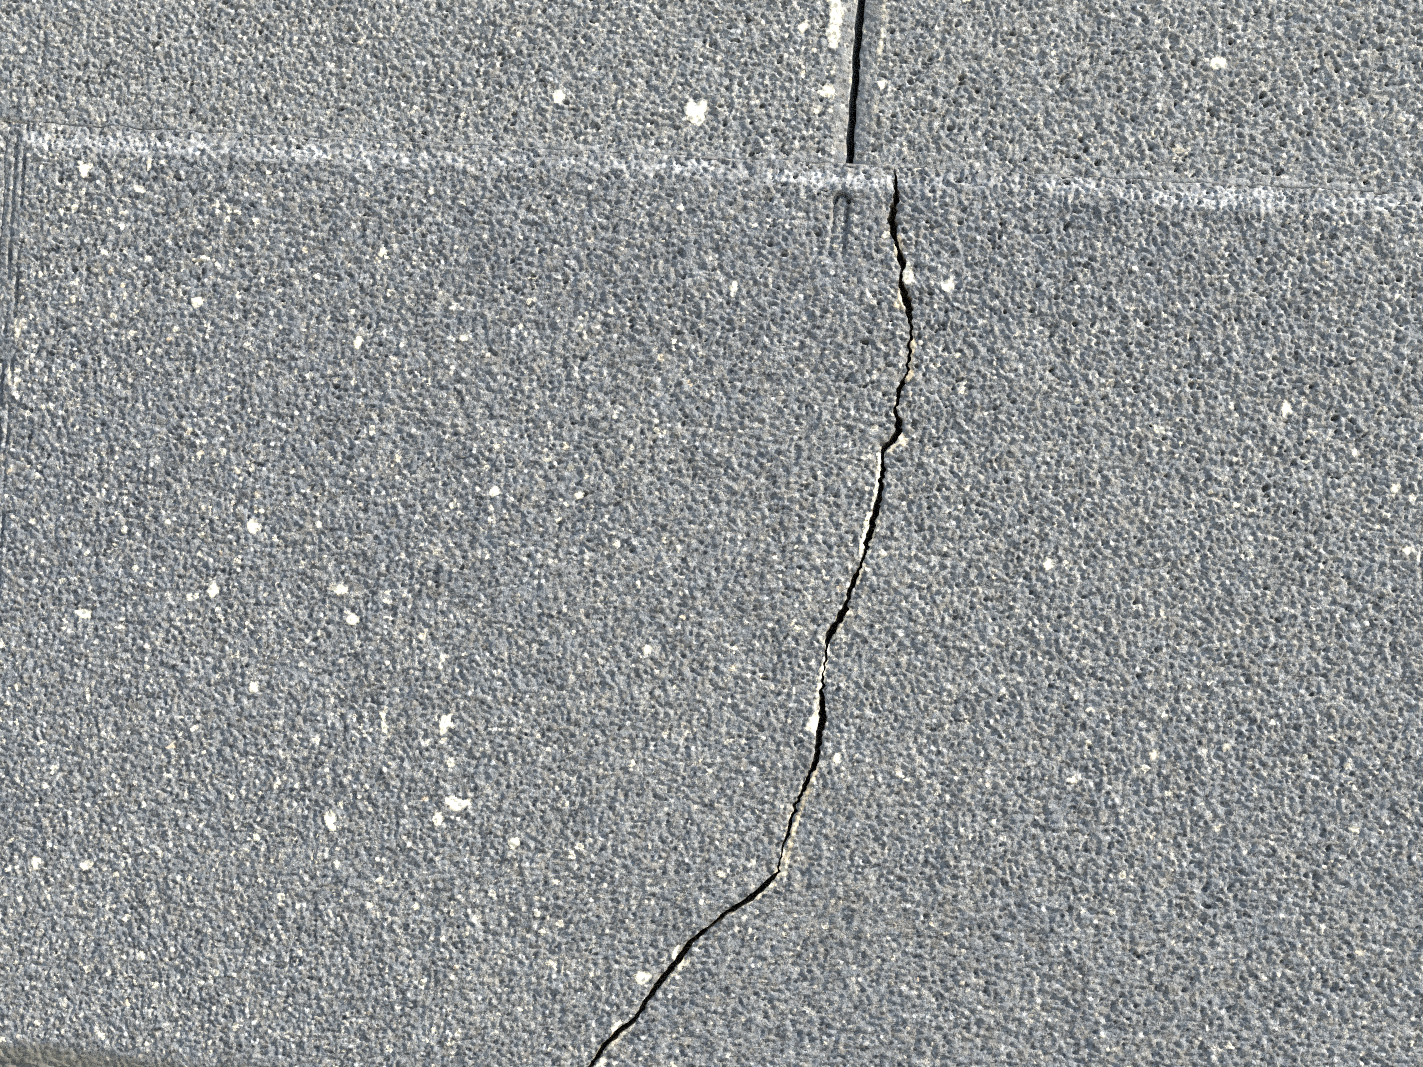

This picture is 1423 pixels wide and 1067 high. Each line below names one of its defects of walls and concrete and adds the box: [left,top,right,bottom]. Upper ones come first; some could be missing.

crack [588,167,917,1067]